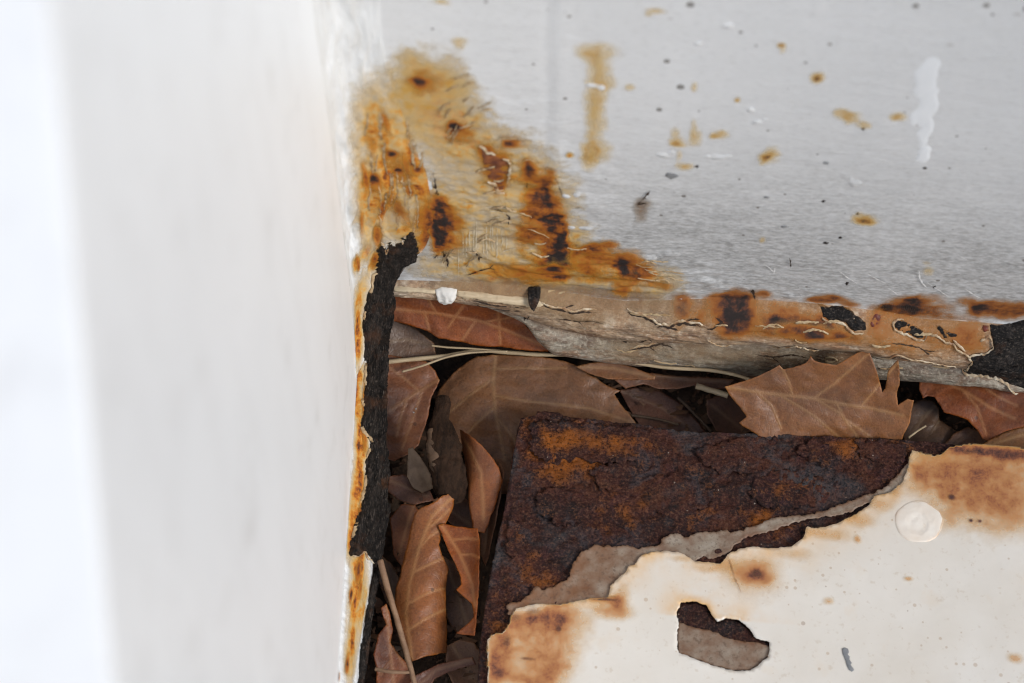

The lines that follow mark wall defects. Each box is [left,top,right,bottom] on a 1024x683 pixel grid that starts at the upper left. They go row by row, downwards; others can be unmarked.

crack [524,302,602,325]
crack [623,308,731,351]
corrosion [339,42,1024,683]
crack [759,345,819,363]
crack [871,343,956,368]
spalling [478,411,962,683]